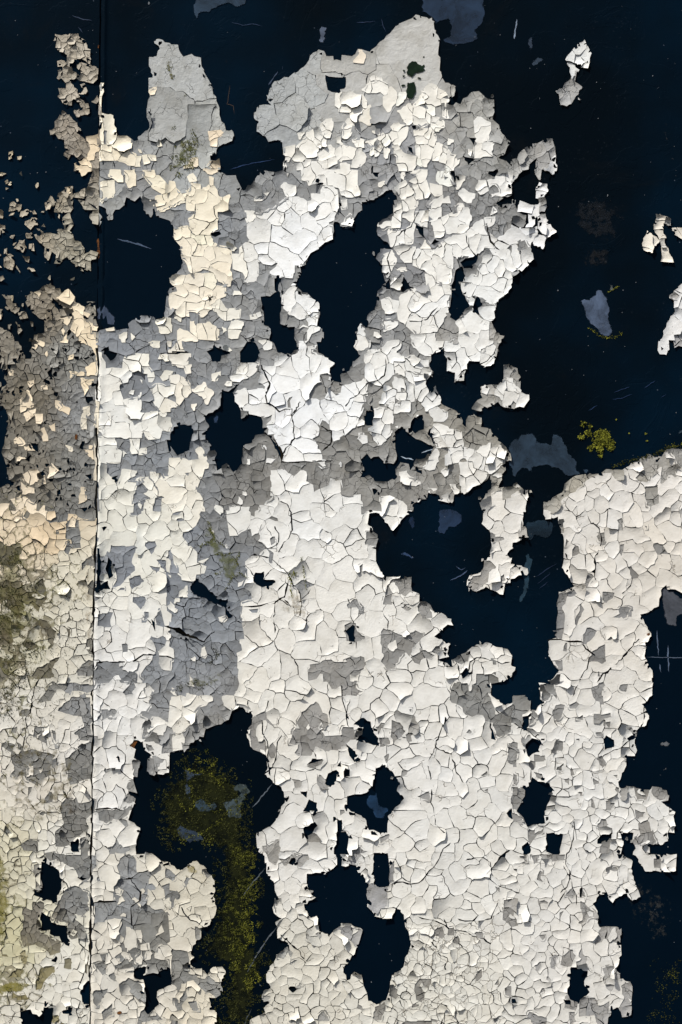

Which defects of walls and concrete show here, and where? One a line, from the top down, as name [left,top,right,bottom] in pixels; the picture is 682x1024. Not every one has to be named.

peeling [422,0,485,45]
peeling [0,248,20,272]
peeling [9,199,36,217]
peeling [34,34,416,462]
crack [262,368,332,464]
peeling [321,15,682,872]
crack [89,348,142,1024]
crack [168,626,210,642]
crack [253,585,310,631]
peeling [0,283,640,1024]
crack [549,639,637,695]
crack [428,722,463,830]